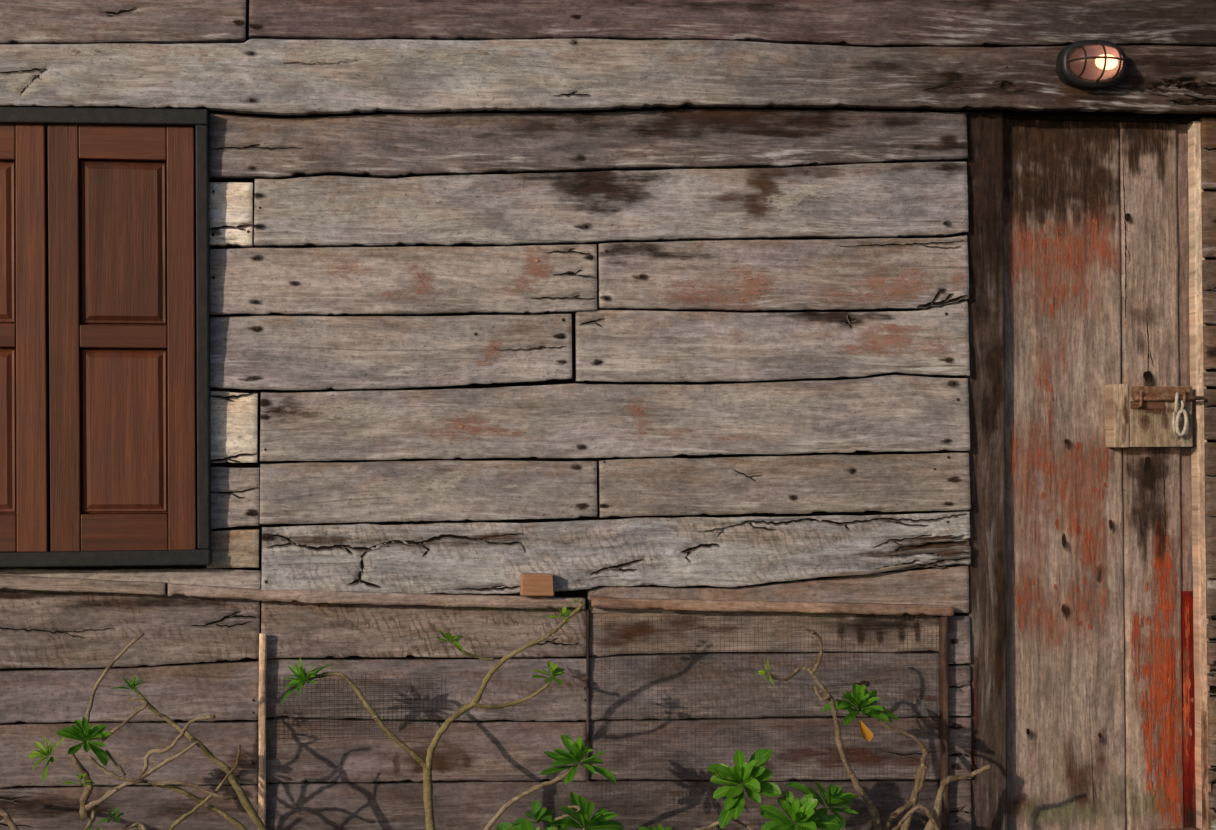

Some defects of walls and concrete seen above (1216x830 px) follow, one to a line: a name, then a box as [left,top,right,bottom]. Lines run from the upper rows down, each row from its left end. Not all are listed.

damp [524,171,658,214]
damp [719,168,825,217]
damp [940,111,1175,323]
peeling [1004,214,1119,318]
peeling [1010,364,1108,645]
crack [267,533,525,588]
crack [455,584,520,592]
crack [590,558,644,576]
crack [680,513,971,569]
peeling [1130,519,1216,830]